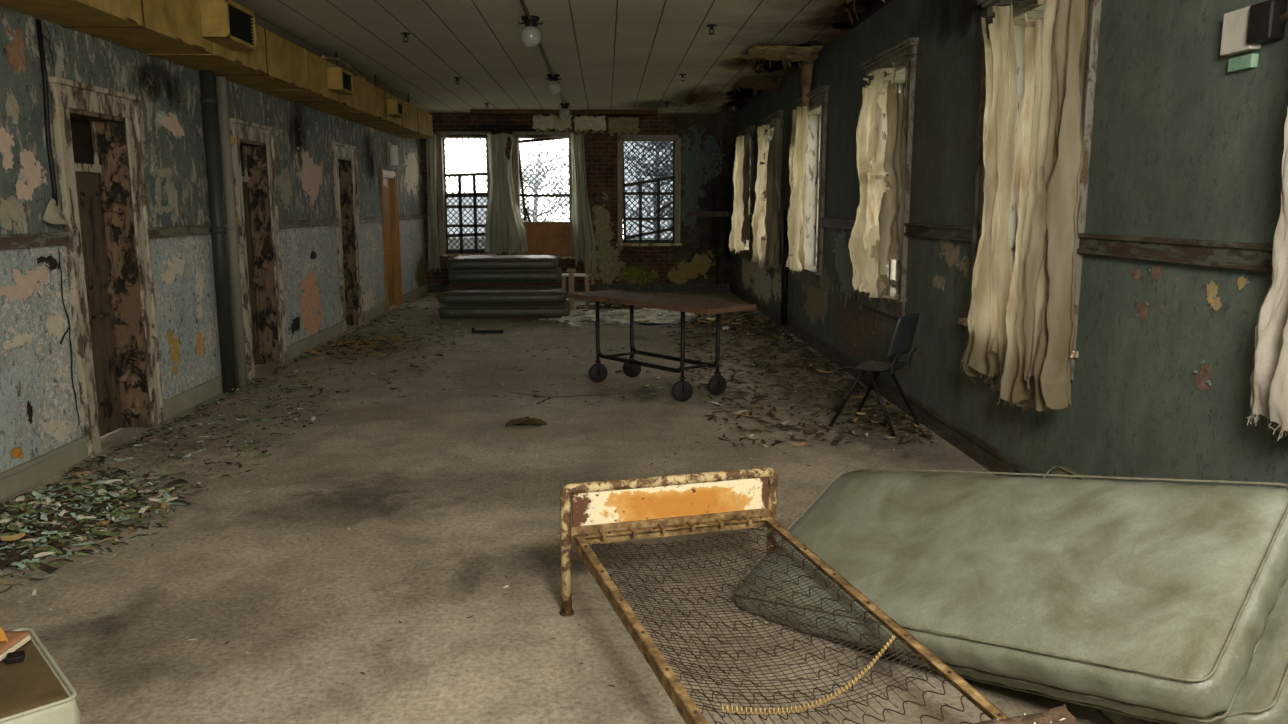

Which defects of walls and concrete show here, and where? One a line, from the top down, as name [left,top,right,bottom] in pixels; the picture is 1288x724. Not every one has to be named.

peeling [0,28,71,235]
peeling [149,163,175,216]
peeling [155,111,186,139]
peeling [277,115,323,210]
peeling [404,146,422,201]
water stain [631,89,716,108]
flaking render [677,119,725,234]
peeling [3,307,65,350]
peeling [161,255,206,377]
peeling [289,251,322,335]
flaking render [589,191,626,285]
flaking render [665,250,717,284]